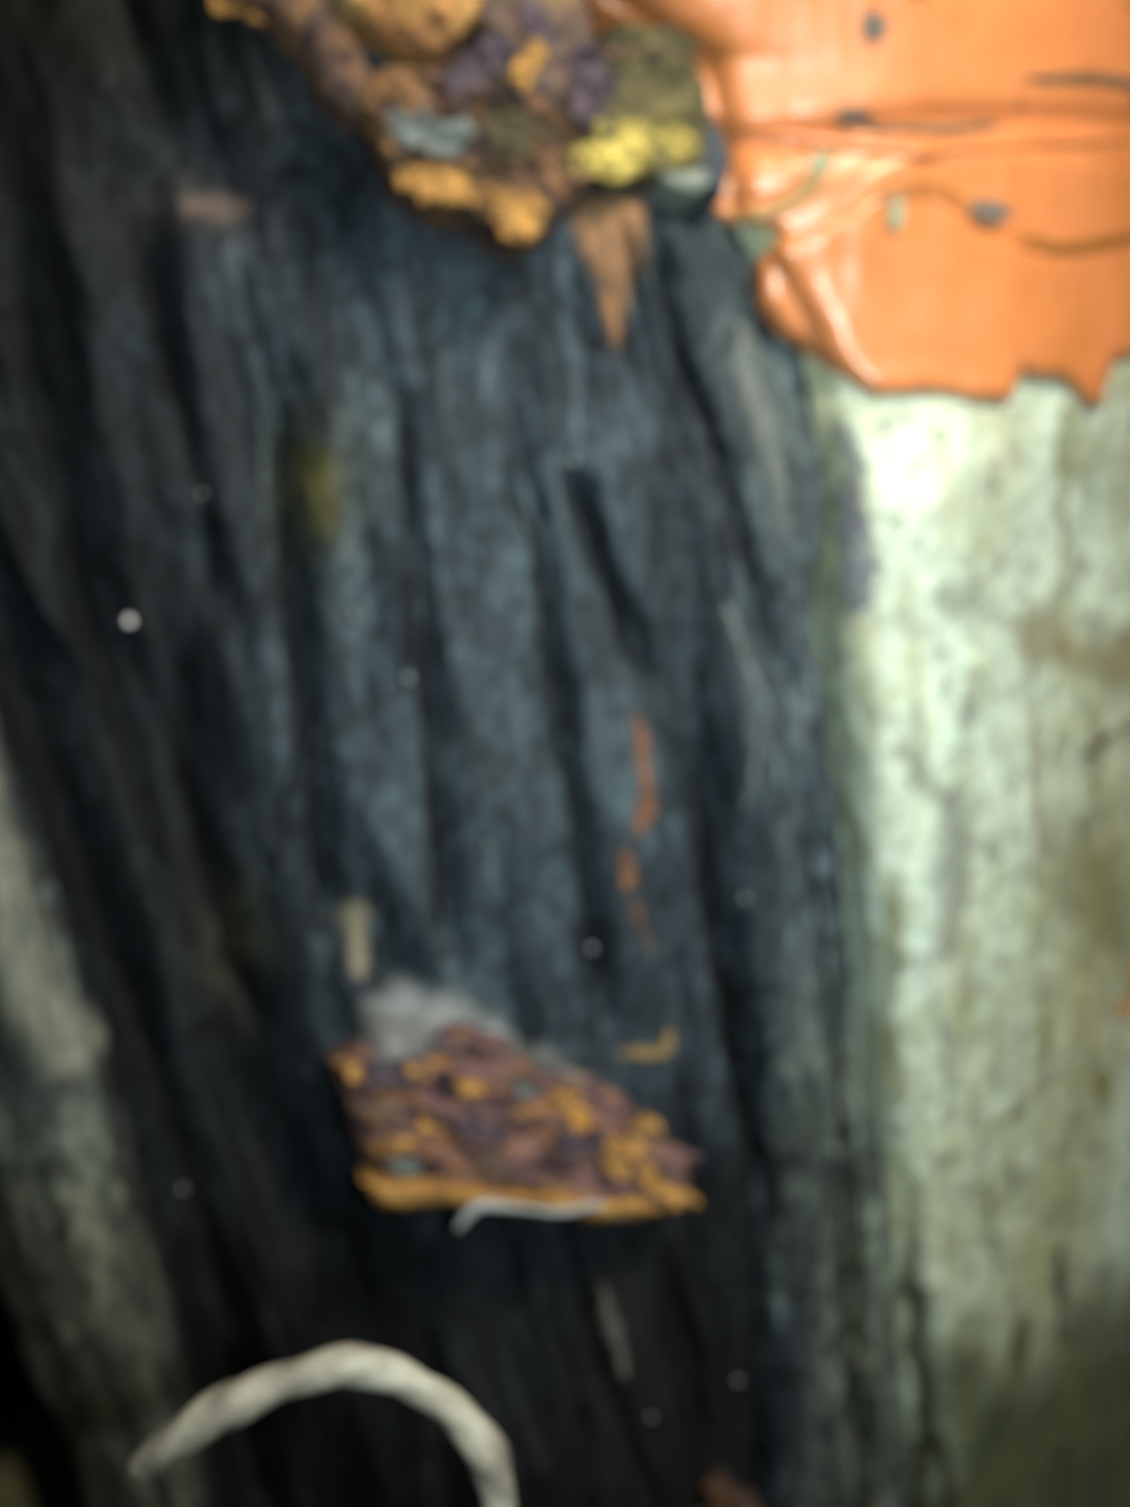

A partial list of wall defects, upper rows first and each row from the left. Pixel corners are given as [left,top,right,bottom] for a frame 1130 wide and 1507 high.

rust [568,23,732,344]
peeling [438,0,1130,247]